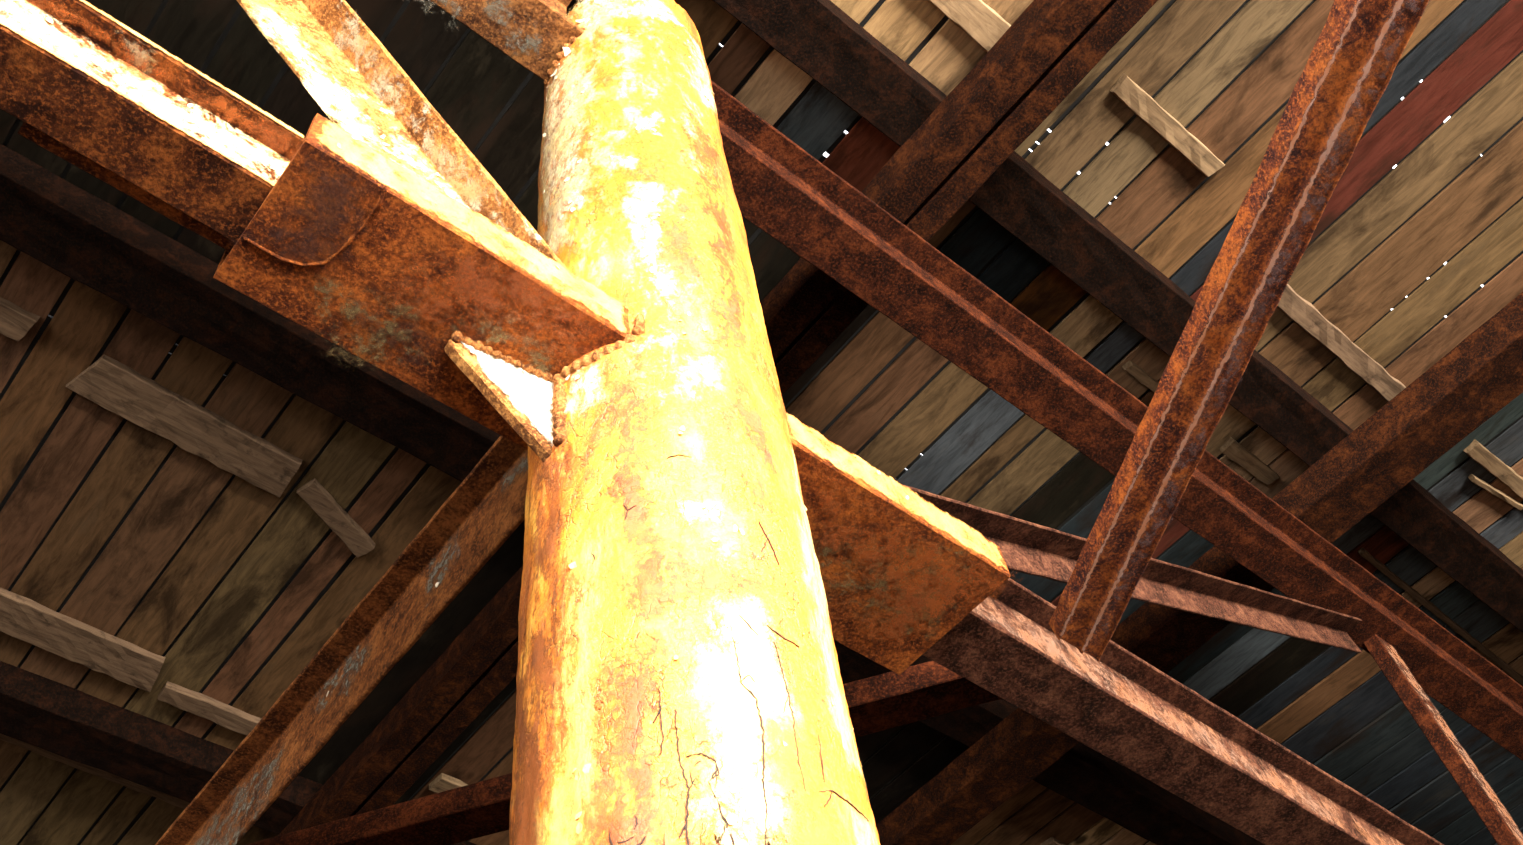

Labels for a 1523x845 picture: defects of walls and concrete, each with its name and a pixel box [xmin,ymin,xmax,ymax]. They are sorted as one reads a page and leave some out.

corrosion [0,0,304,186]
corrosion [573,21,746,354]
corrosion [394,250,609,362]
corrosion [1060,0,1428,651]
corrosion [602,383,664,607]
corrosion [509,444,571,845]
corrosion [587,634,670,845]
crack [653,614,869,845]
corrosion [757,623,849,845]
corrosion [1387,645,1523,845]